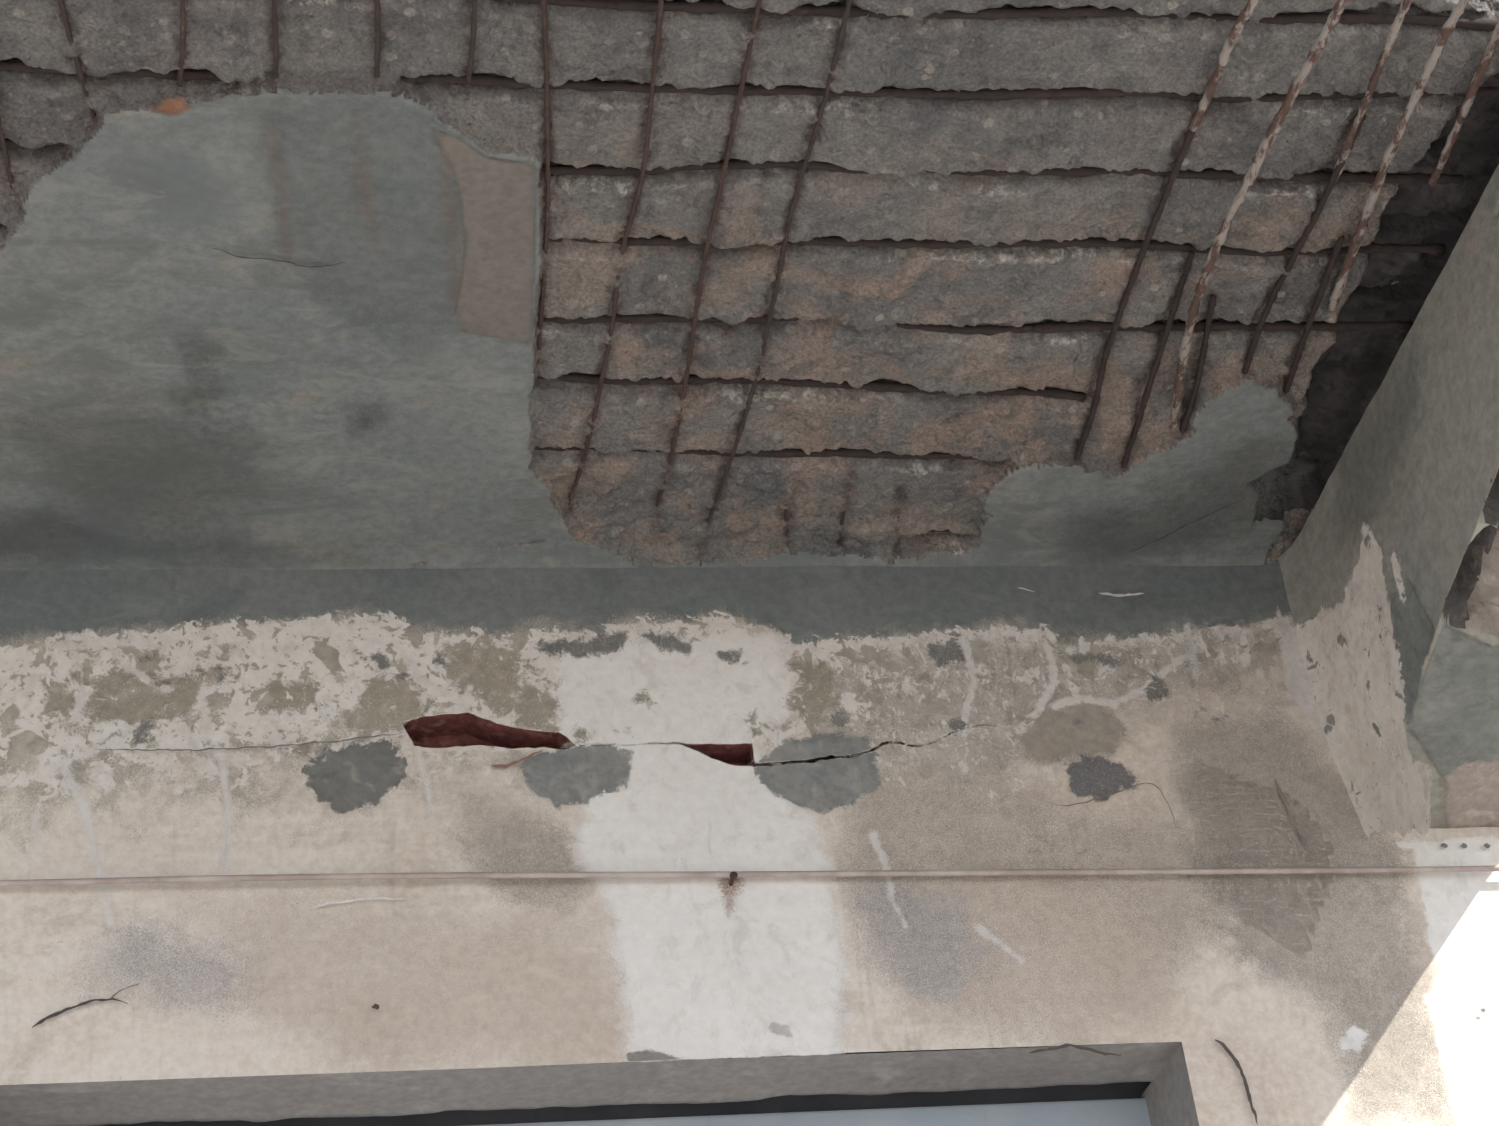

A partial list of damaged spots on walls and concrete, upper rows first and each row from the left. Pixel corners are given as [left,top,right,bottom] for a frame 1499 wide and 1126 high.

rust [148,96,195,117]
spalling [0,0,1499,568]
peeling [0,522,1499,855]
crack [99,712,1007,768]
crack [32,982,142,1028]